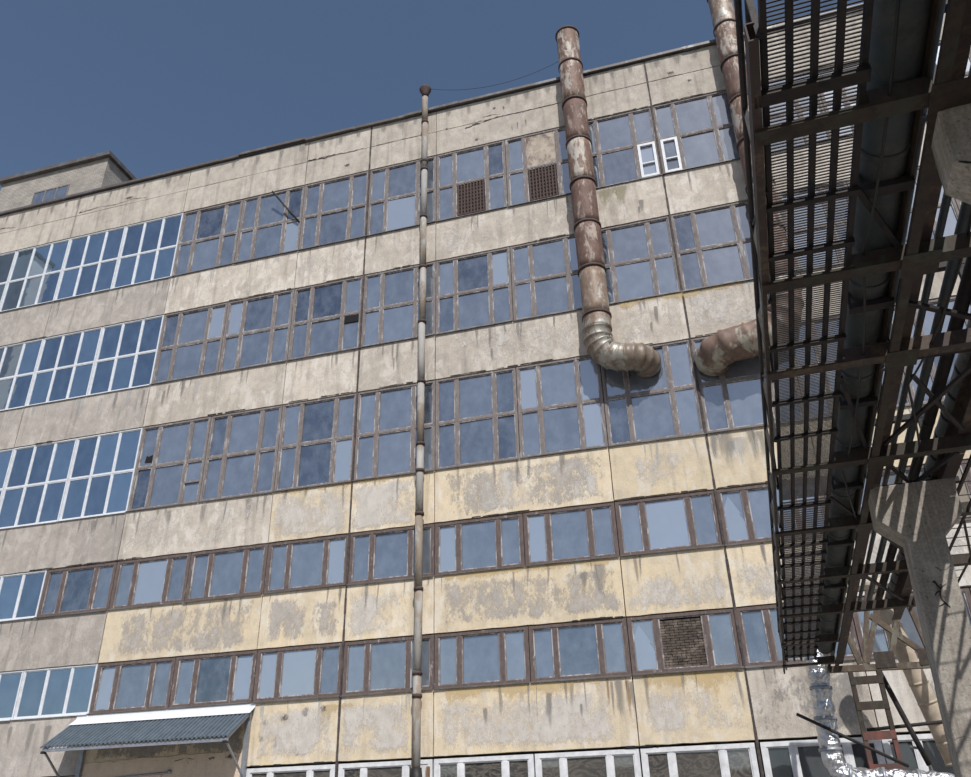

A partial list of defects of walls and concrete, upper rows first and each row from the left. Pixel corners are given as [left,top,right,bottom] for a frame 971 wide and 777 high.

peeling [447,457,603,518]
peeling [445,571,623,623]
crack [932,565,951,608]
peeling [119,605,249,654]
damp [445,679,598,712]
peeling [442,692,612,746]
damp [643,668,735,692]